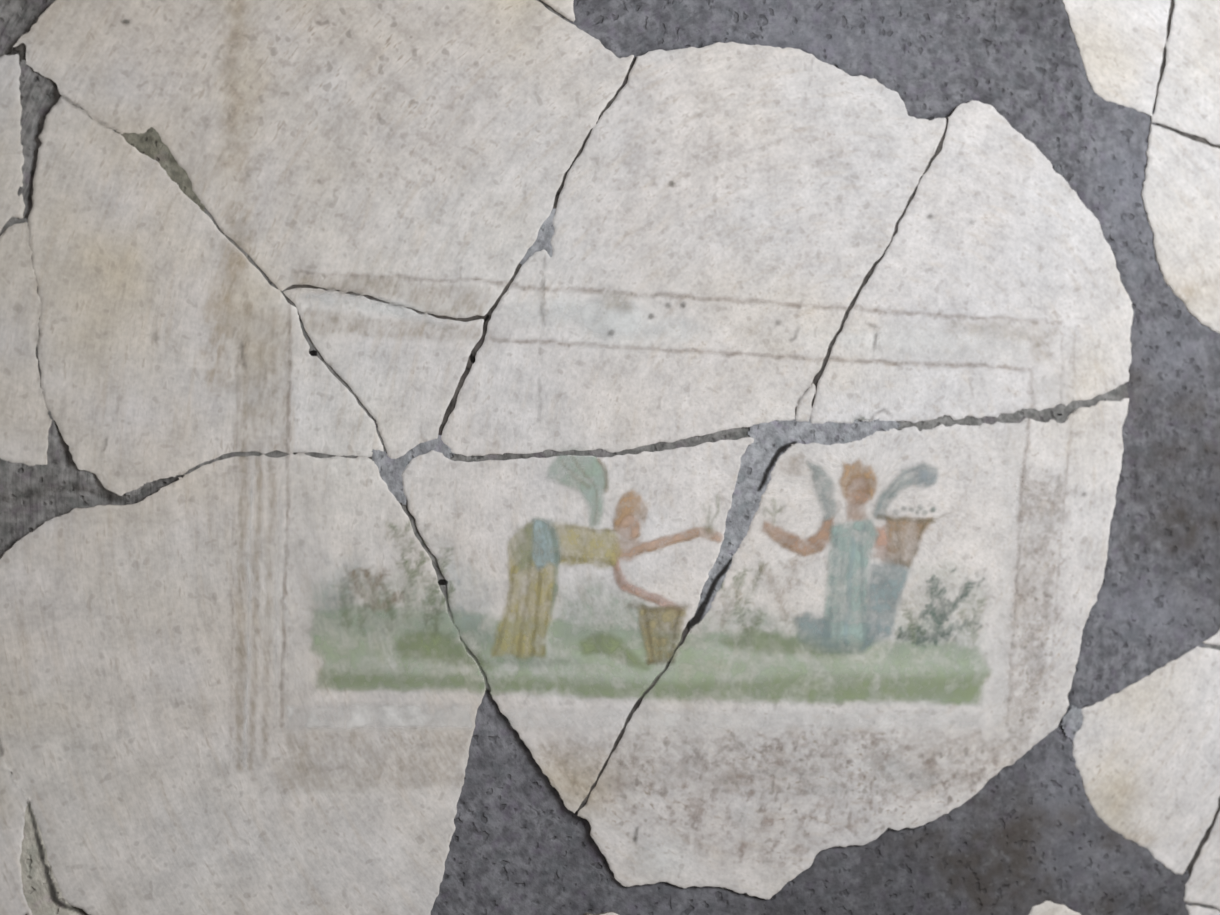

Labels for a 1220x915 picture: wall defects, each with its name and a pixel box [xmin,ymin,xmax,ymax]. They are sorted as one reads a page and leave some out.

crack [7,43,26,62]
crack [537,0,569,22]
crack [553,58,636,209]
crack [1153,0,1220,149]
crack [0,217,28,236]
crack [176,208,750,476]
crack [758,119,948,491]
crack [895,382,1129,431]
crack [400,500,491,694]
crack [573,559,732,814]
crack [29,804,89,915]
crack [1186,797,1220,912]